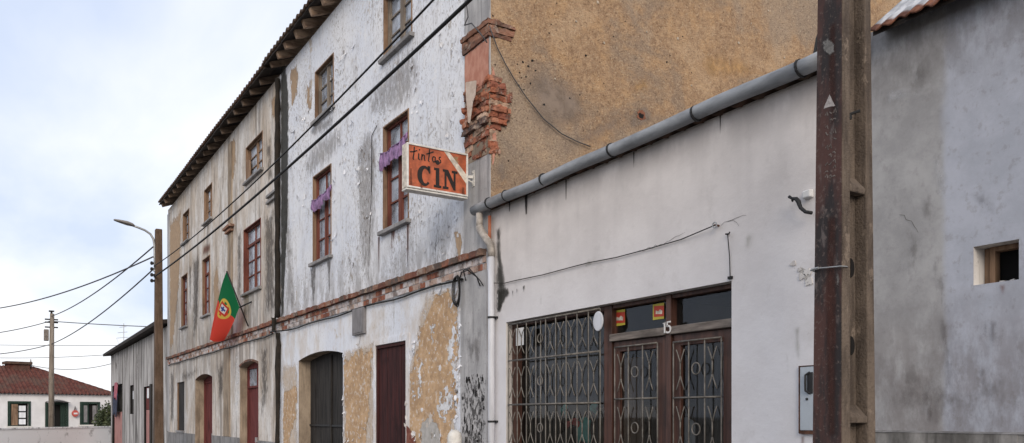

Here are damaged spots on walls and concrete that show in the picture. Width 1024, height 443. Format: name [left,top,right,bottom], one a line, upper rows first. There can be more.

peeling [288,64,312,145]
spalling [437,26,537,164]
water stain [497,229,524,311]
spalling [790,260,813,286]
peeling [283,366,298,443]
peeling [342,343,373,443]
peeling [404,288,486,443]